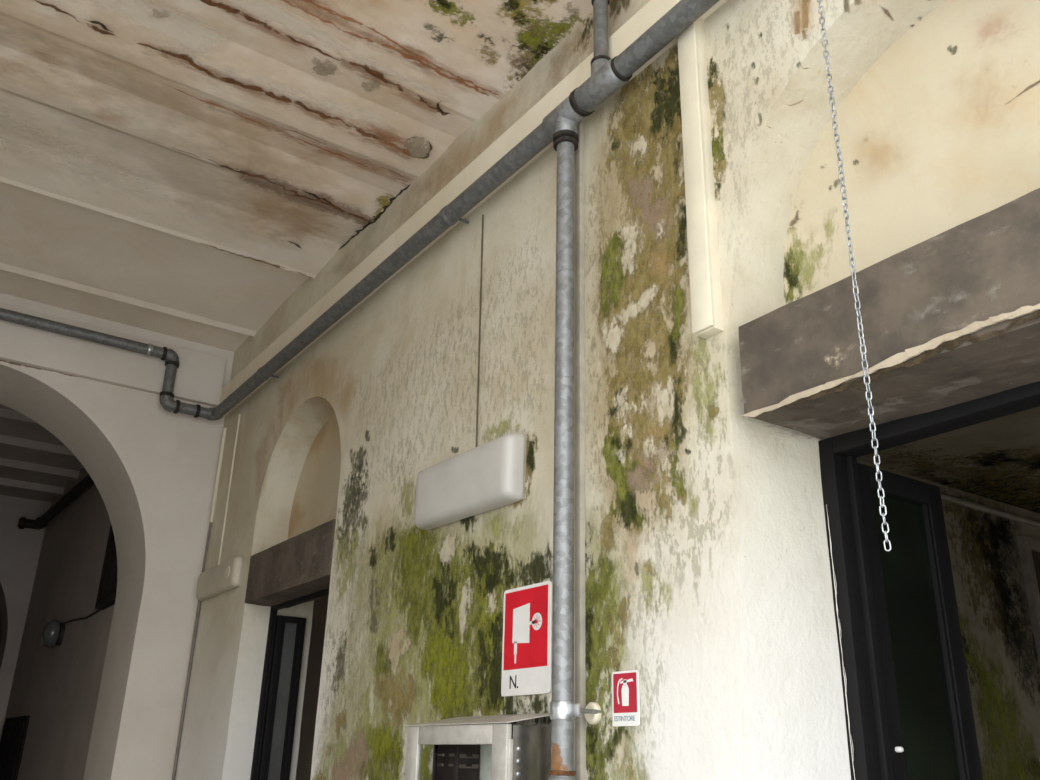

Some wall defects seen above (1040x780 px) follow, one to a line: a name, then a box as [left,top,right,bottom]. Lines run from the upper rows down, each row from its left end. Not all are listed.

crack [201,0,498,116]
leakage [480,35,497,64]
leakage [508,2,593,87]
crack [35,0,432,249]
leakage [689,337,722,437]
leakage [484,421,537,508]
leakage [336,431,369,599]
leakage [879,445,1040,702]
leakage [332,634,346,691]
corrosion [551,743,568,771]